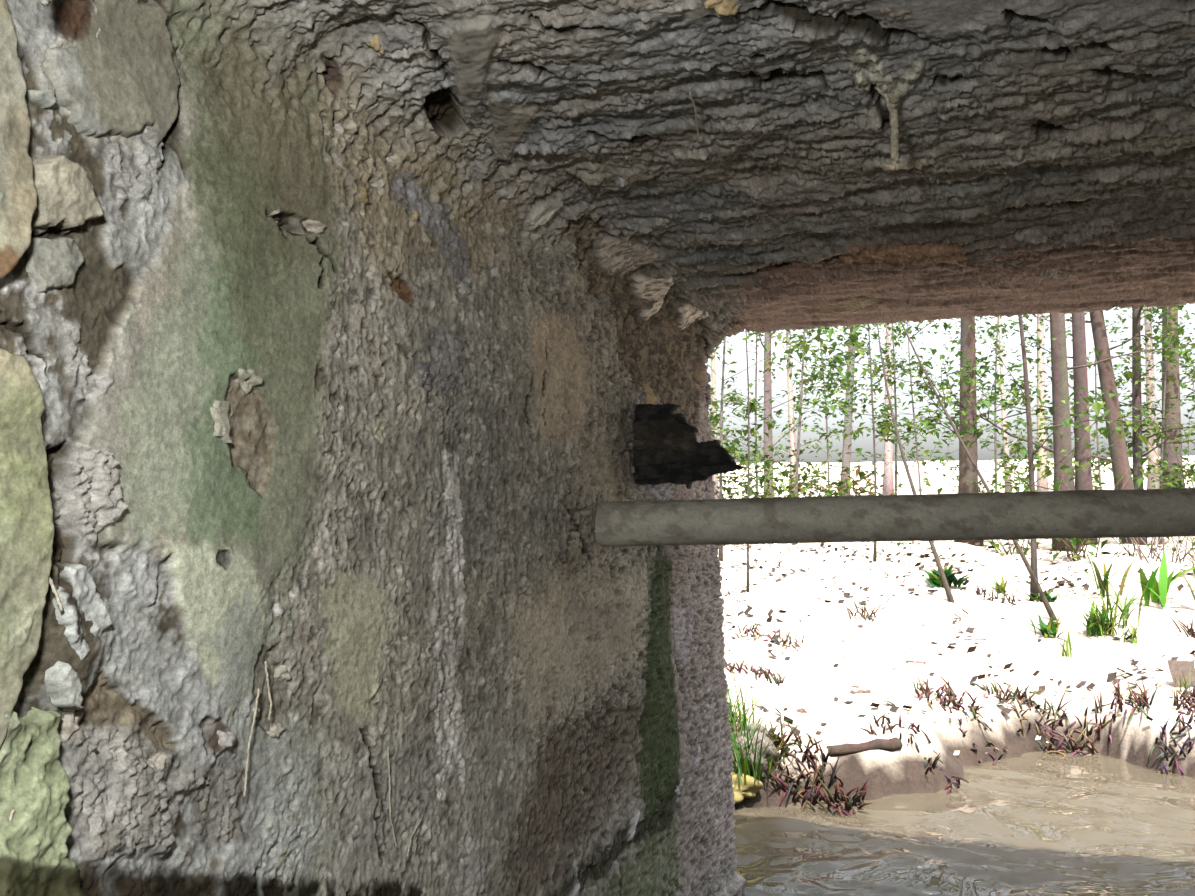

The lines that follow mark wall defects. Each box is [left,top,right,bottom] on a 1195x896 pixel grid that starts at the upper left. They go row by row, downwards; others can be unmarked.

spalling [423,87,461,131]
crack [309,239,336,289]
spalling [210,368,275,496]
water stain [672,605,694,666]
crack [360,732,383,858]
water stain [0,857,422,896]
water stain [454,836,486,896]